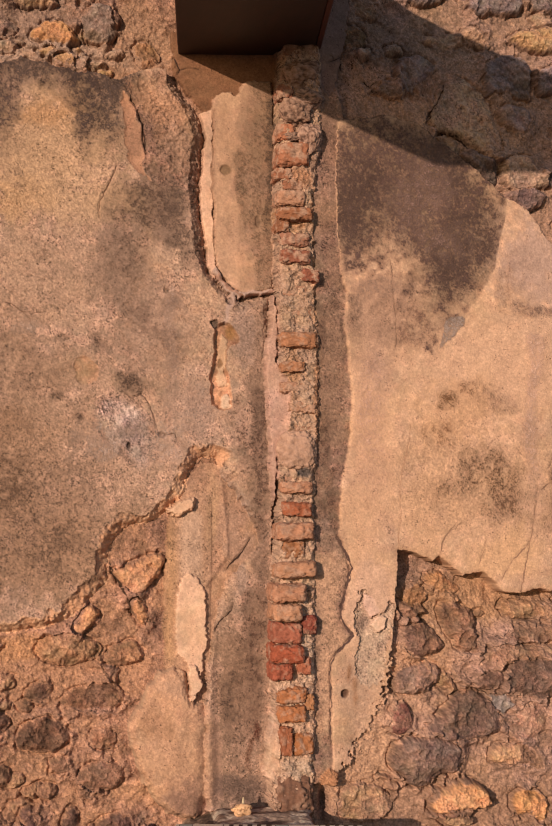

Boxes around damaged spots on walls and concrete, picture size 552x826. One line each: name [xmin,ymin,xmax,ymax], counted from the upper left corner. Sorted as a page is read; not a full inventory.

water stain [0,56,140,144]
water stain [323,115,505,352]
spalling [209,322,241,411]
flaking render [166,497,196,518]
crack [502,457,552,592]
flaking render [174,573,208,701]
crack [329,538,354,742]